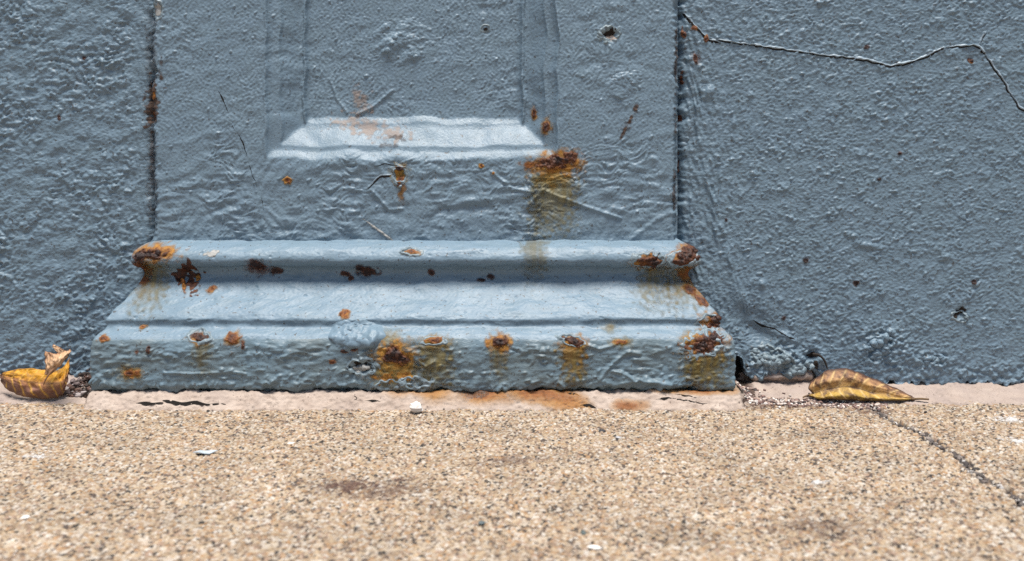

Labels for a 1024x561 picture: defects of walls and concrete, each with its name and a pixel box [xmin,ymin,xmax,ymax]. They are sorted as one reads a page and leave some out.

crack [683,13,1024,111]
corrosion [390,162,408,199]
corrosion [524,150,585,248]
corrosion [132,243,175,300]
corrosion [249,259,283,274]
corrosion [341,265,381,280]
corrosion [627,244,734,394]
corrosion [329,333,593,409]